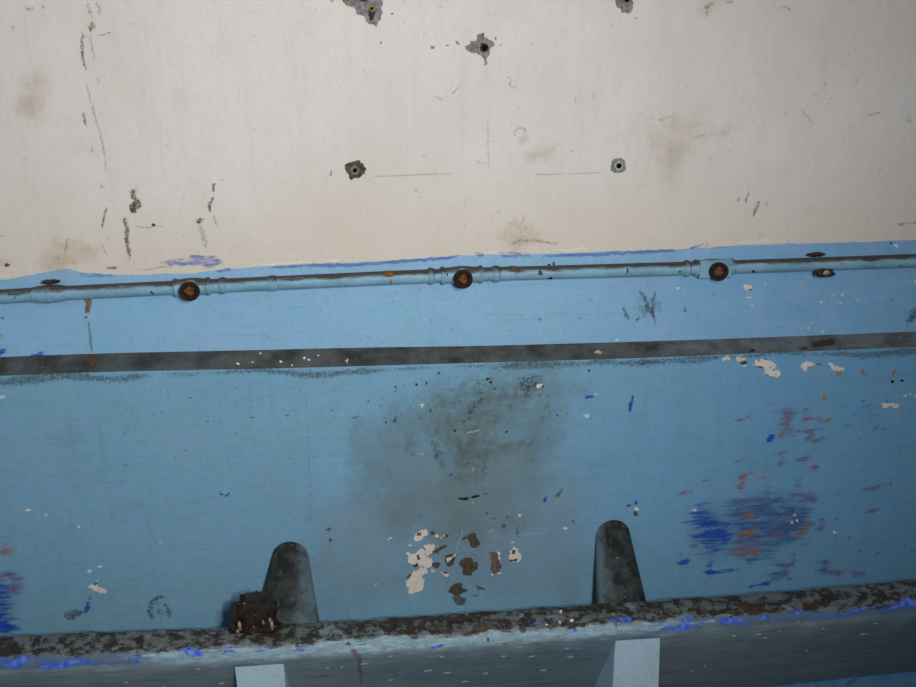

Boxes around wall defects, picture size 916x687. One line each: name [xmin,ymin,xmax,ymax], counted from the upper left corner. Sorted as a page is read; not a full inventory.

flaking render [331,0,393,26]
flaking render [615,0,637,19]
flaking render [446,32,502,66]
flaking render [345,160,366,180]
peeling [722,355,781,378]
peeling [800,361,844,376]
peeling [677,474,852,565]
peeling [0,573,23,633]
spalling [183,529,772,670]
spalling [792,601,822,623]
spalling [889,598,916,609]